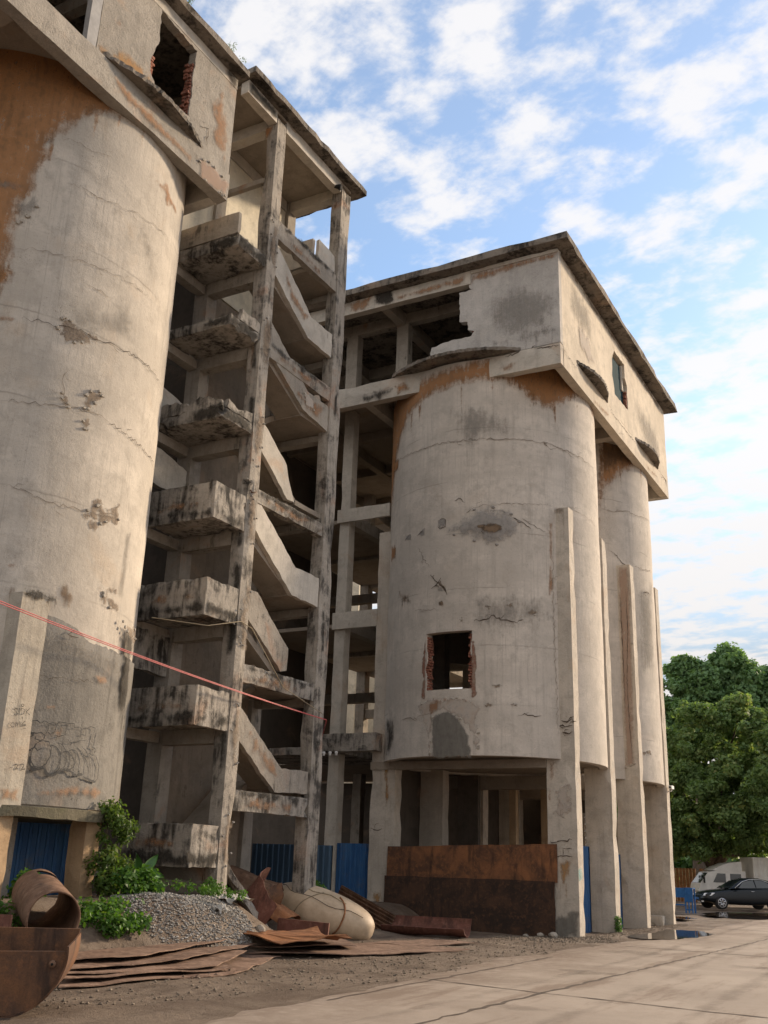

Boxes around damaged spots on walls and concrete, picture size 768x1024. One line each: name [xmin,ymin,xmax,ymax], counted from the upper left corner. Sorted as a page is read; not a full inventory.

peeling [119,53,155,80]
flaking render [180,63,194,115]
spalling [55,316,97,344]
crack [26,318,155,374]
crack [0,367,154,462]
spalling [60,389,104,431]
crack [398,437,594,469]
spalling [84,499,120,530]
crack [455,498,575,736]
flaking render [422,637,434,699]
damp [432,712,471,758]